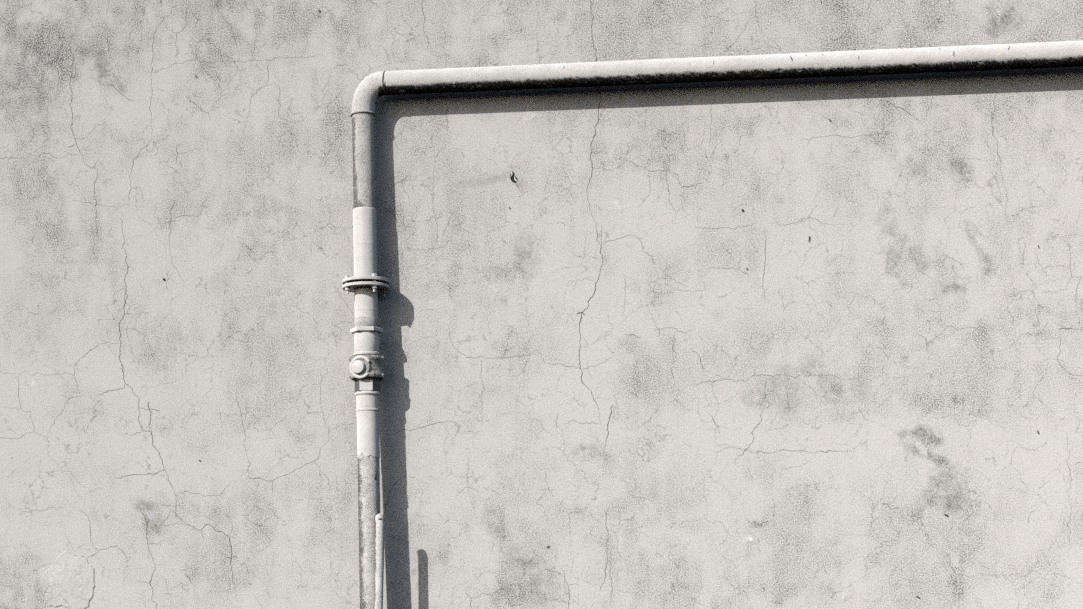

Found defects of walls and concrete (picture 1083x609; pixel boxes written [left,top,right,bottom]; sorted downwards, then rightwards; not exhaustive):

crack [0,40,330,603]
crack [515,6,688,449]